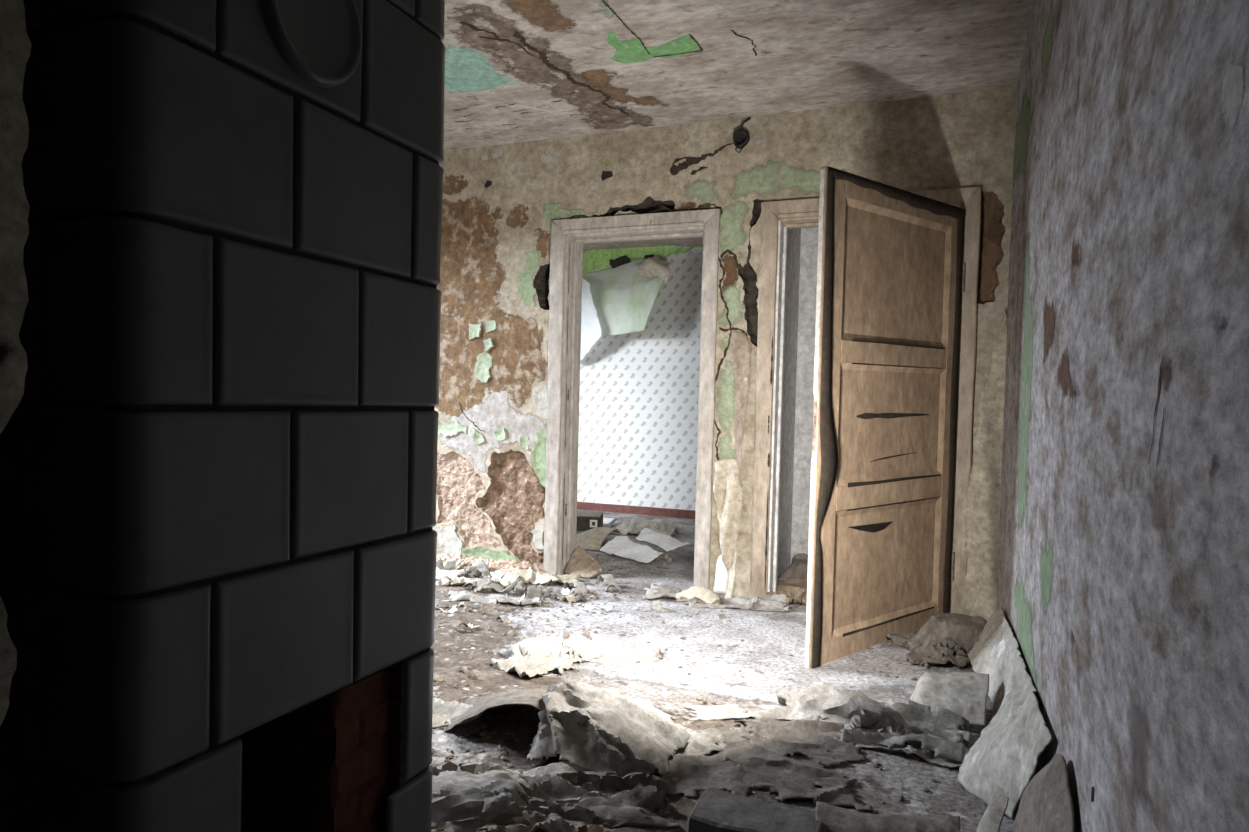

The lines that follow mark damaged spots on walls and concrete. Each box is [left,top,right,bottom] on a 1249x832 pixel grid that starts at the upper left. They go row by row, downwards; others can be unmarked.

peeling [600,0,700,63]
peeling [444,45,515,129]
crack [670,143,734,175]
crack [569,212,612,220]
peeling [517,251,550,310]
flaking render [542,180,773,459]
crack [647,203,748,383]
peeling [469,320,496,383]
crack [713,418,721,461]
spalling [434,420,547,567]